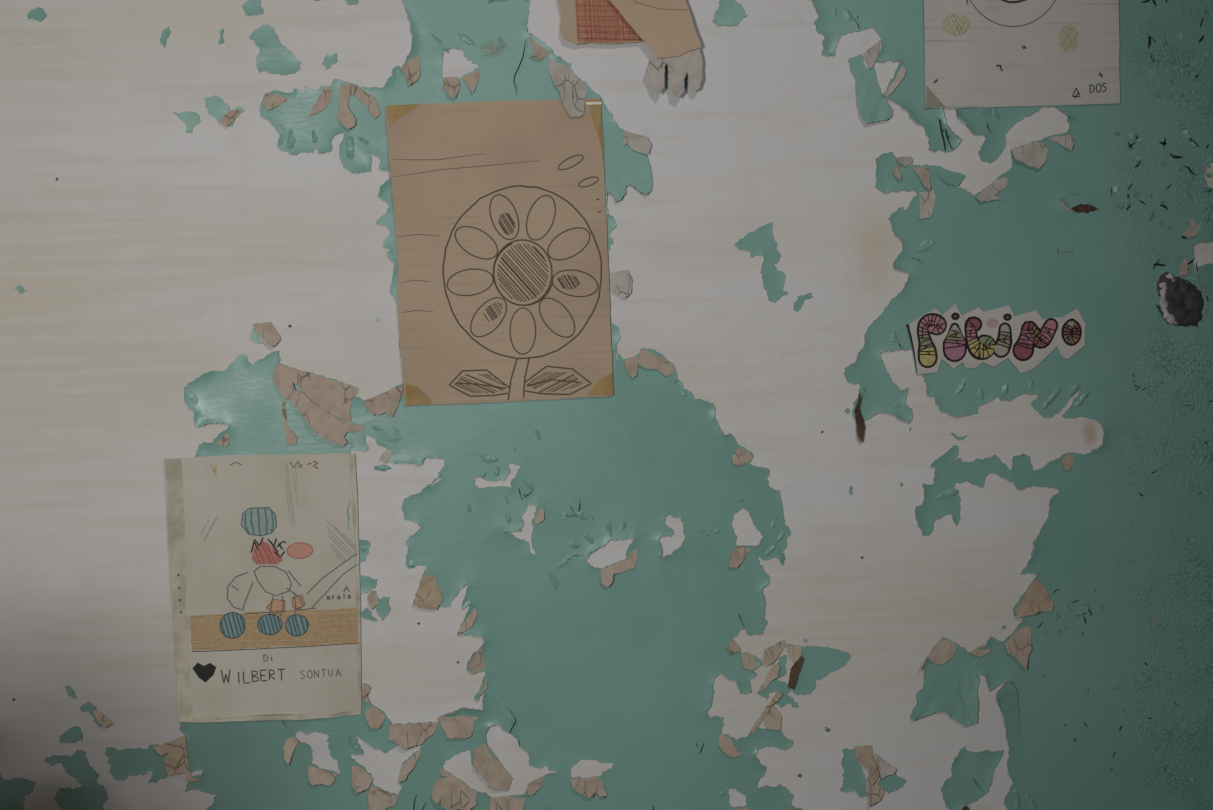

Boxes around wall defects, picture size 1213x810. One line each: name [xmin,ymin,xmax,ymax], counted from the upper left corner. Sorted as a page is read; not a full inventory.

peeling [0,0,613,810]
peeling [526,0,1103,810]
spalling [1157,217,1213,327]
peeling [1203,162,1213,188]